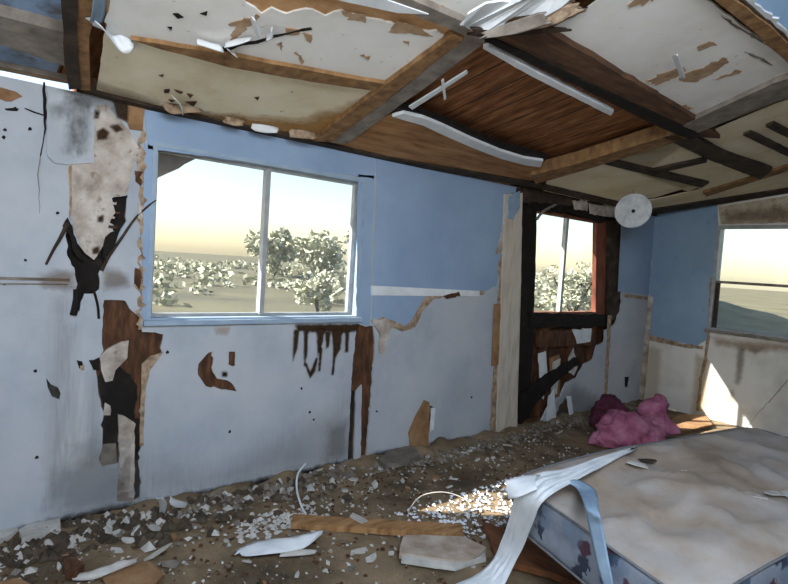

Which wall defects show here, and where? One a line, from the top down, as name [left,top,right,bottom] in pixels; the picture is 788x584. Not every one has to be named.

peeling [228,14,260,40]
peeling [644,54,742,86]
peeling [0,87,23,111]
crack [25,82,47,213]
peeling [223,116,279,133]
peeling [46,91,96,260]
peeling [102,202,121,259]
peeling [80,340,129,382]
peeling [198,352,236,391]
leakage [293,324,359,378]
peeling [538,328,592,378]
peeling [100,352,163,503]